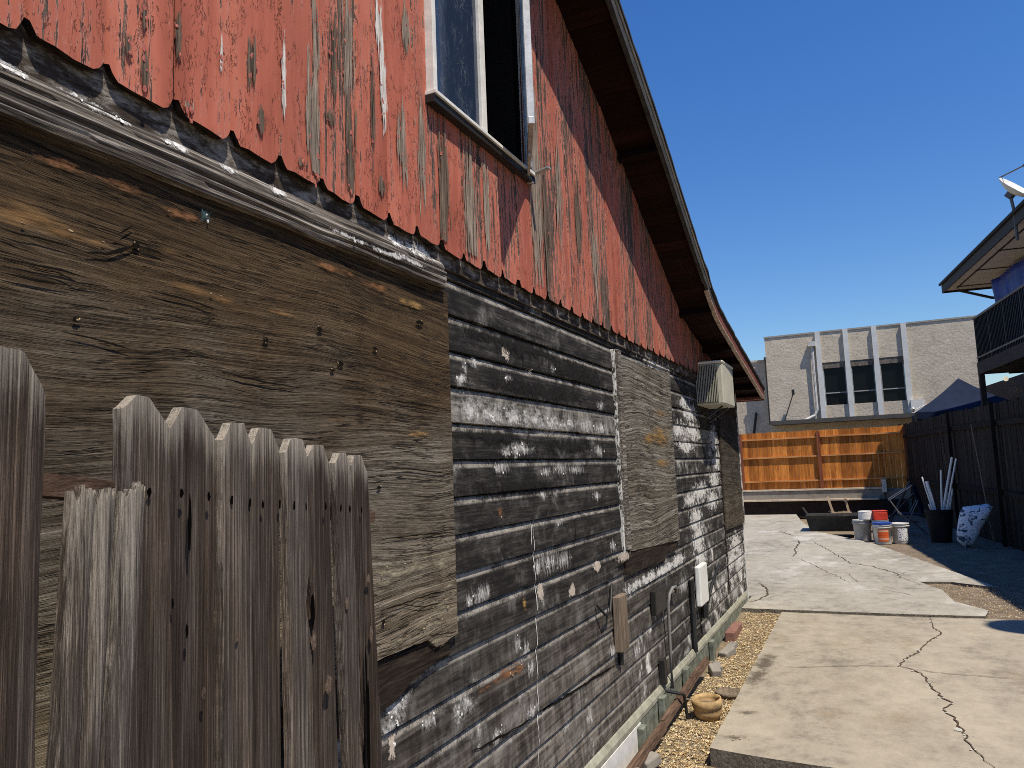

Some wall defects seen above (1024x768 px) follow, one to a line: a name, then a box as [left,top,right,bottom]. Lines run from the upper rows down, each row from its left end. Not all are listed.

peeling [0,60,28,79]
peeling [56,87,131,126]
peeling [126,36,149,92]
peeling [247,37,258,89]
peeling [299,0,358,195]
peeling [370,0,491,257]
peeling [529,41,600,309]
peeling [330,227,435,267]
damp [463,320,605,405]
damp [455,428,596,456]
damp [457,478,560,501]
crack [781,531,1014,768]